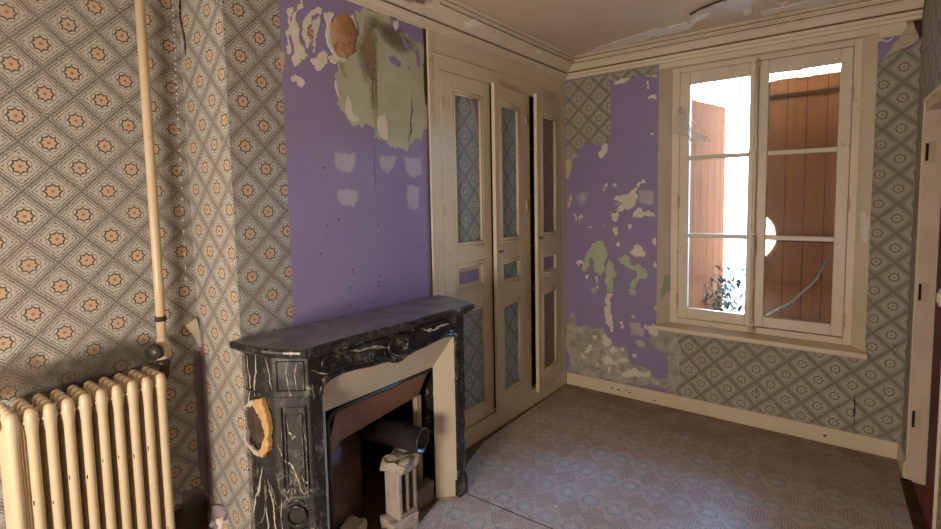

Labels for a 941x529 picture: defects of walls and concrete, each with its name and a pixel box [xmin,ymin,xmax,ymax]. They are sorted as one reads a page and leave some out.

crack [178,0,186,56]
peeling [335,7,428,151]
water stain [360,25,409,137]
peeling [568,194,655,247]
peeling [581,315,658,374]